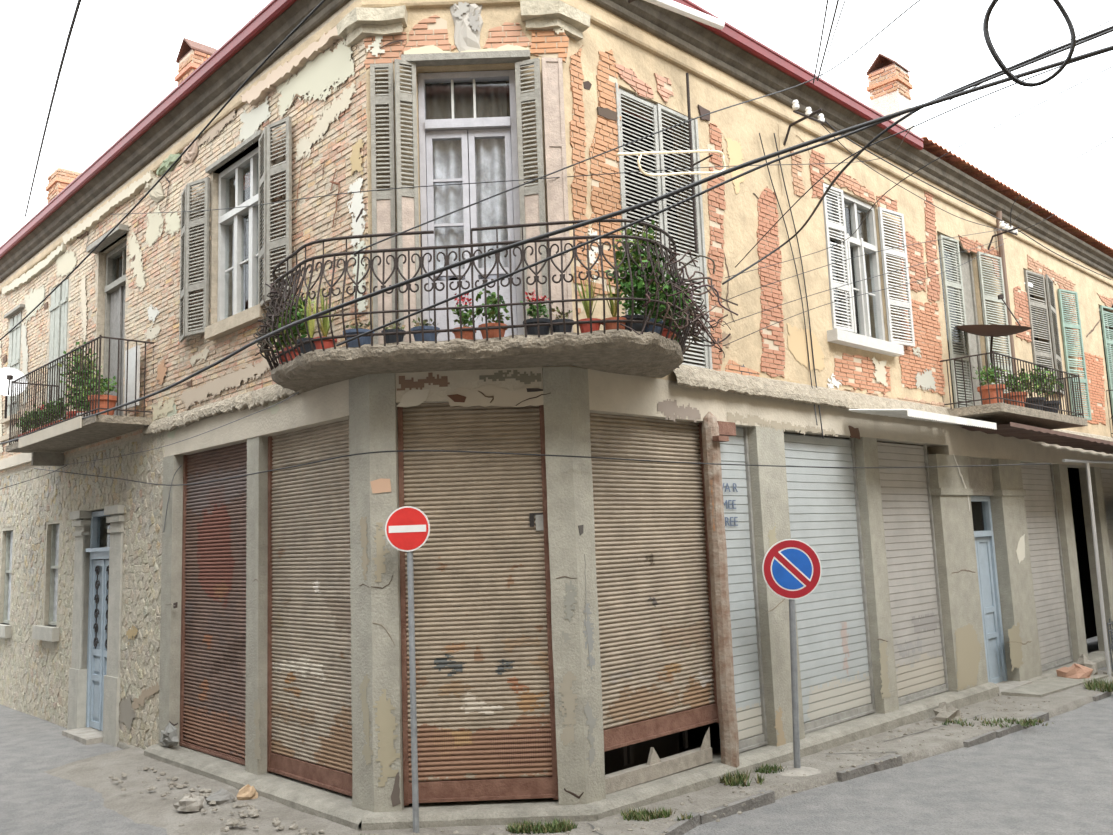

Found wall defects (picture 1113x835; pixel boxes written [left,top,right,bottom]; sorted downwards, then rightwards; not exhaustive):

spalling [707,123,786,378]
spalling [790,150,945,407]
spalling [958,235,1000,279]
spalling [1013,286,1032,342]
spalling [1027,254,1106,425]
crack [479,391,550,406]
rust [196,484,236,608]
rust [183,677,245,759]
rust [407,655,475,698]
rust [408,677,558,781]